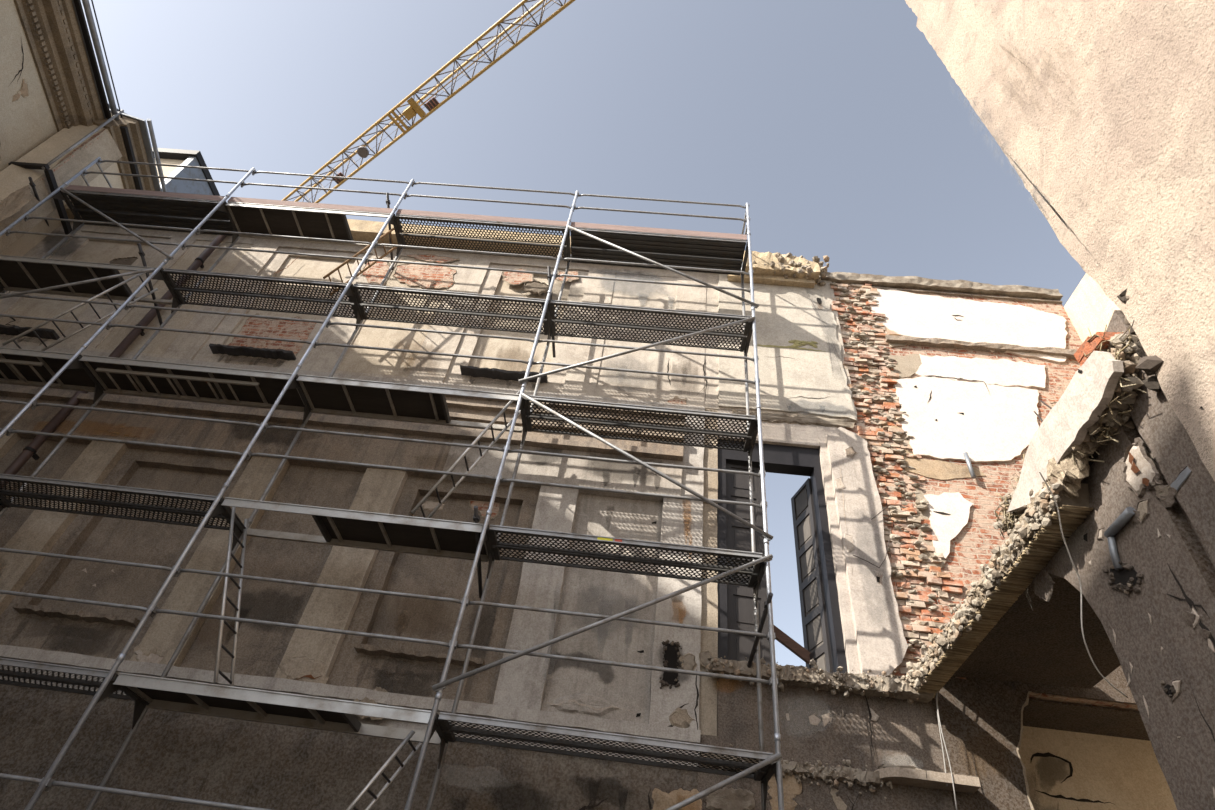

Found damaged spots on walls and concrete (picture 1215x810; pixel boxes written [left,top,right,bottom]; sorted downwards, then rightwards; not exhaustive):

crack [8,40,24,87]
flaking render [362,254,459,289]
flaking render [228,313,316,357]
flaking render [877,331,922,388]
flaking render [888,398,986,568]
spalling [1123,437,1177,538]
peeling [1032,568,1055,602]
crack [1167,563,1215,655]
spalling [659,639,714,689]
crack [1190,684,1215,742]
spalling [651,773,814,810]
crack [1030,752,1113,810]